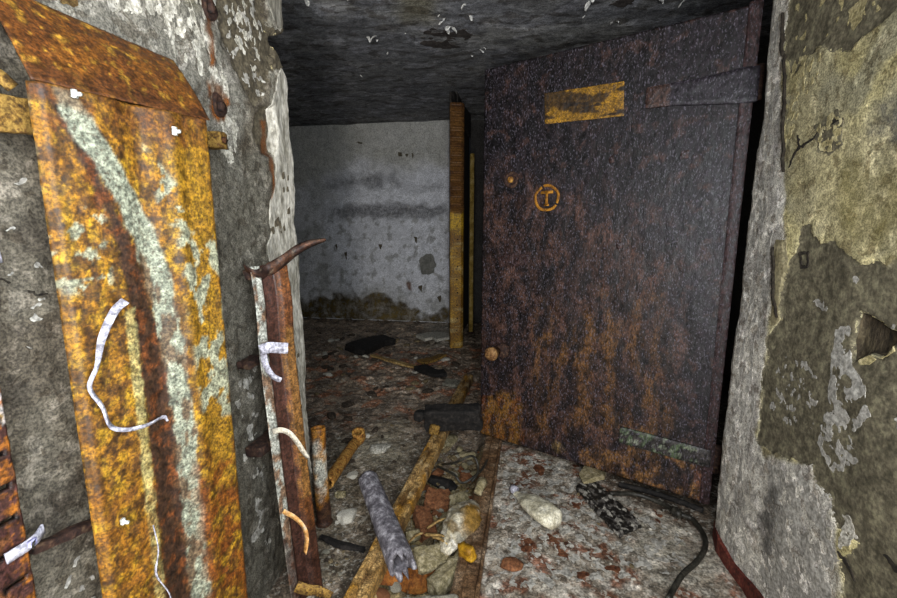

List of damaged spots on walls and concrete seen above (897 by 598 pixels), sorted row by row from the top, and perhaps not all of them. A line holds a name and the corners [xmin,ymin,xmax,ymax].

corrosion [206,17,216,66]
peeling [420,3,473,49]
water stain [300,293,449,322]
flaking render [716,0,897,598]